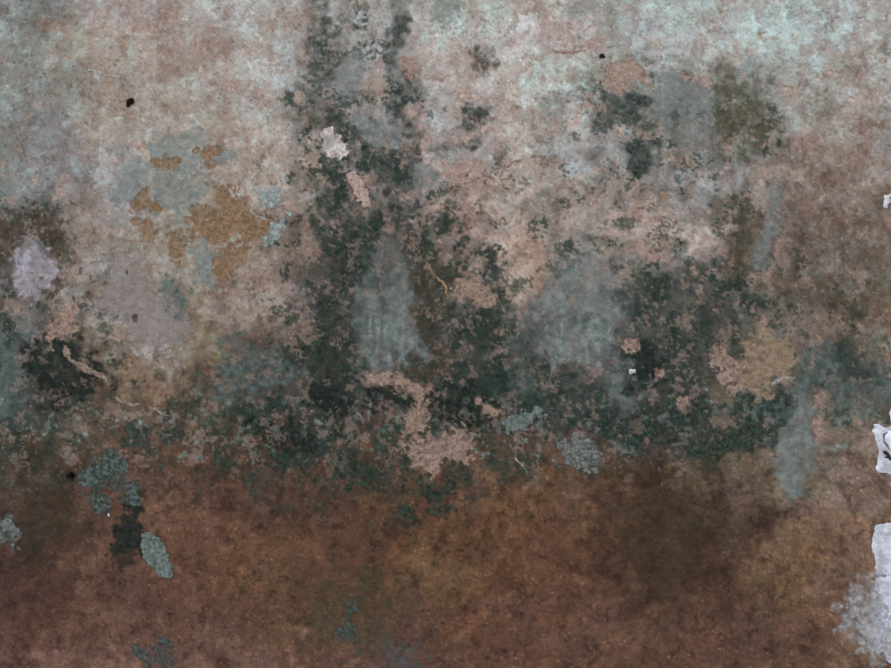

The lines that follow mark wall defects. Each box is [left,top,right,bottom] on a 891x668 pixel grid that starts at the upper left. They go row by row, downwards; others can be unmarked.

spalling [151,154,181,170]
spalling [193,145,223,169]
damp [308,16,412,175]
damp [462,103,488,130]
damp [625,130,661,178]
spalling [130,181,292,287]
damp [308,161,444,283]
damp [434,207,470,272]
damp [19,322,117,411]
damp [302,244,516,494]
damp [621,340,667,397]
damp [587,382,818,497]